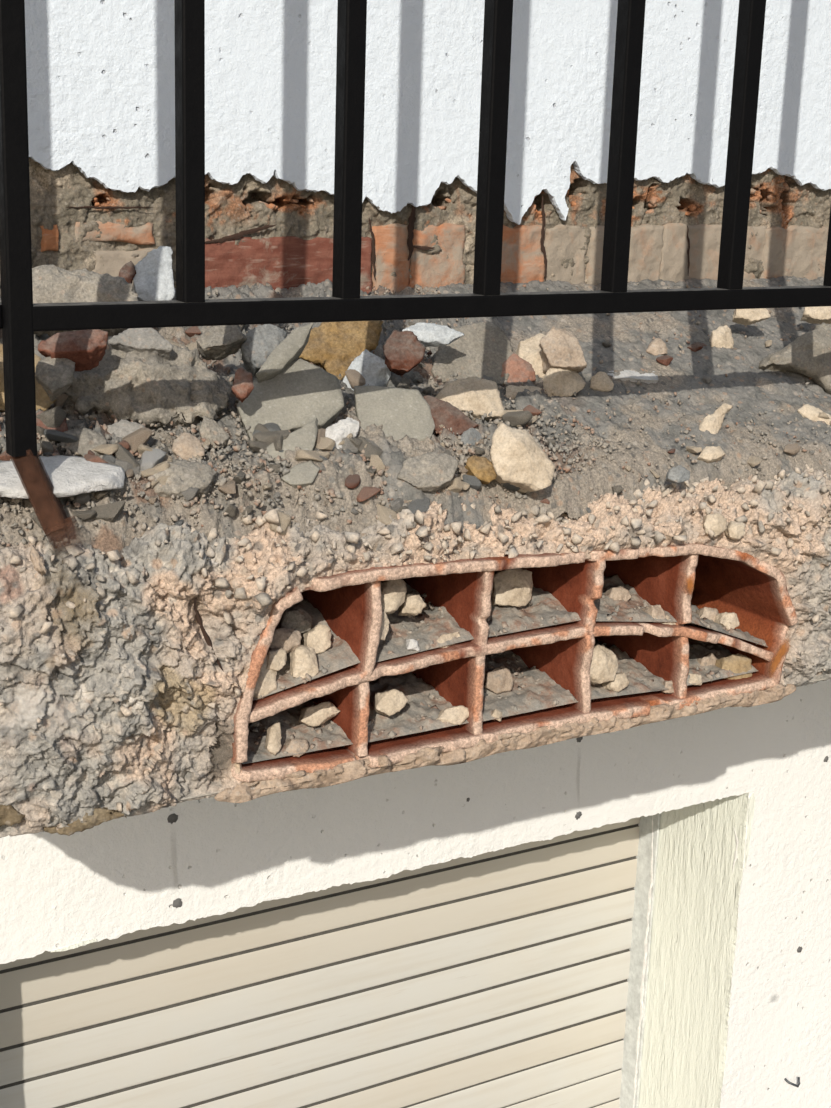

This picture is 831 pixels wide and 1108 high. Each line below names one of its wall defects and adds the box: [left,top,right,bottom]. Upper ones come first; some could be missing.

flaking render [29,157,176,288]
flaking render [205,173,334,290]
flaking render [360,177,477,294]
flaking render [501,164,607,286]
flaking render [628,174,725,283]
flaking render [743,168,831,281]
corrosion [10,451,75,538]
spalling [107,419,145,437]
spalling [259,418,318,465]
spalling [465,455,497,484]
spalling [697,403,733,463]
spalling [0,464,831,838]